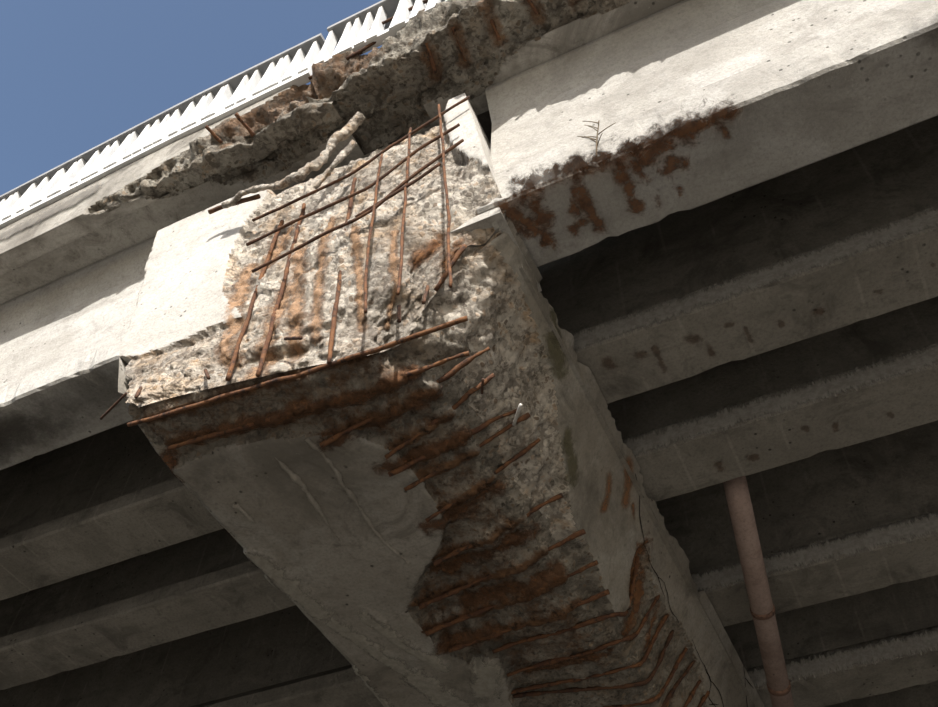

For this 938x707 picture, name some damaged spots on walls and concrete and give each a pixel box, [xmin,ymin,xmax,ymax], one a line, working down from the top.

corrosion [494,100,740,249]
corrosion [220,227,293,363]
corrosion [251,250,305,378]
corrosion [181,364,444,451]
corrosion [350,226,364,323]
spalling [87,0,710,707]
corrosion [413,238,441,266]
crack [635,474,679,622]
crack [693,642,724,707]